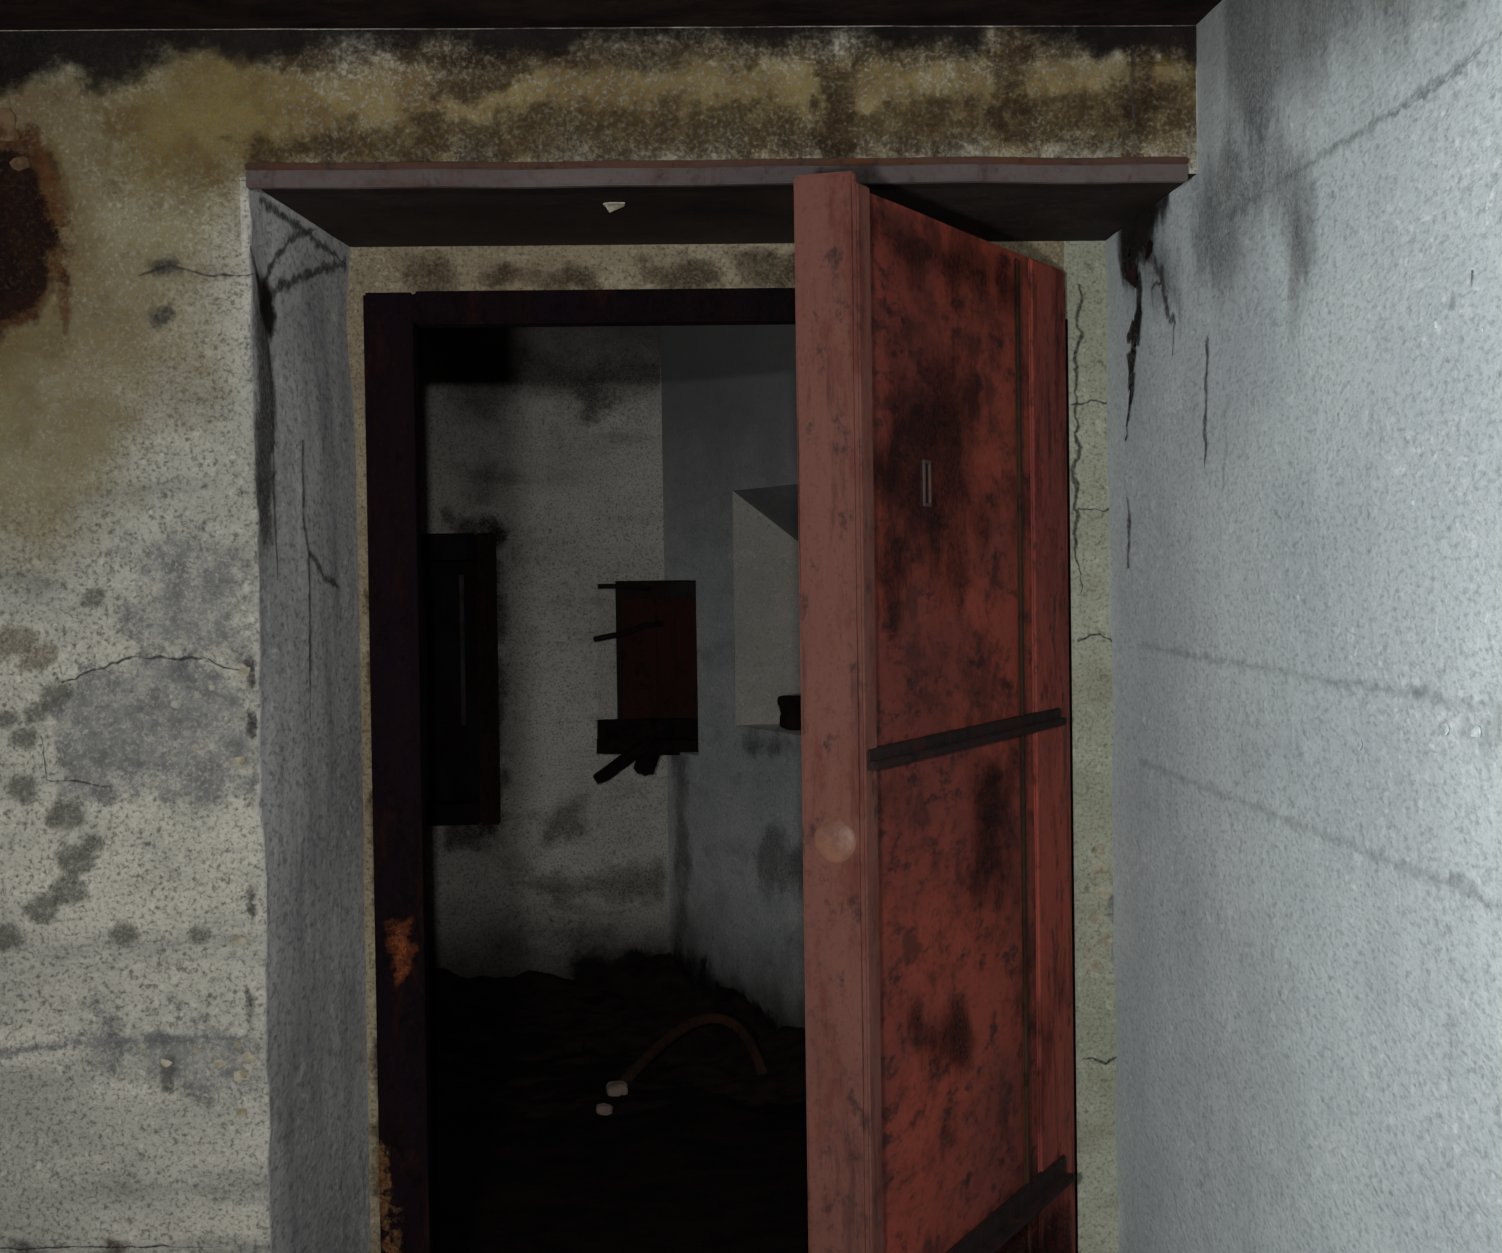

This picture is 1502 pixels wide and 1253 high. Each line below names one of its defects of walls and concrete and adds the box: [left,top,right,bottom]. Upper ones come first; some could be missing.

corrosion [0,108,70,337]
damp [0,25,1197,543]
crack [1071,229,1208,592]
damp [0,629,56,669]
damp [0,684,71,748]
damp [9,776,35,803]
damp [24,801,102,923]
corrosion [386,919,418,983]
crack [1083,1057,1116,1065]
corrosion [378,1145,401,1253]